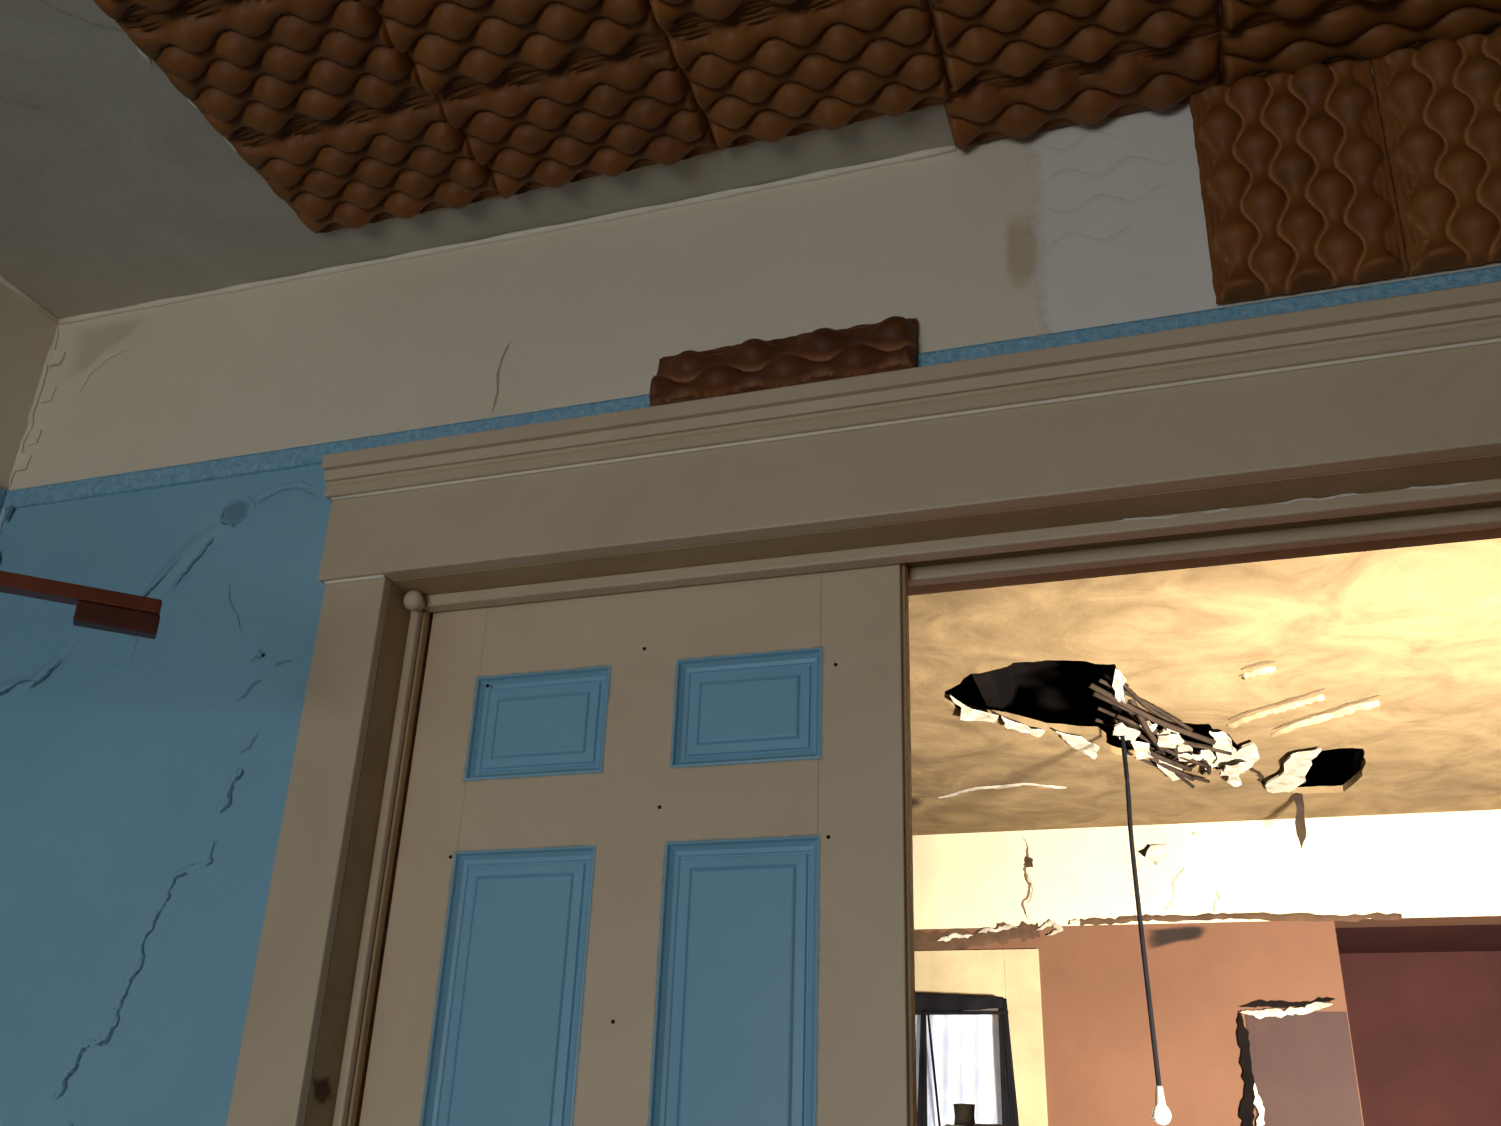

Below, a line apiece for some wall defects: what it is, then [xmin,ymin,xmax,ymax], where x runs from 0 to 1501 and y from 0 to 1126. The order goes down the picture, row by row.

crack [228,590,293,701]
peeling [1241,661,1276,680]
peeling [1228,689,1380,738]
crack [51,732,258,1126]
peeling [1237,997,1363,1126]